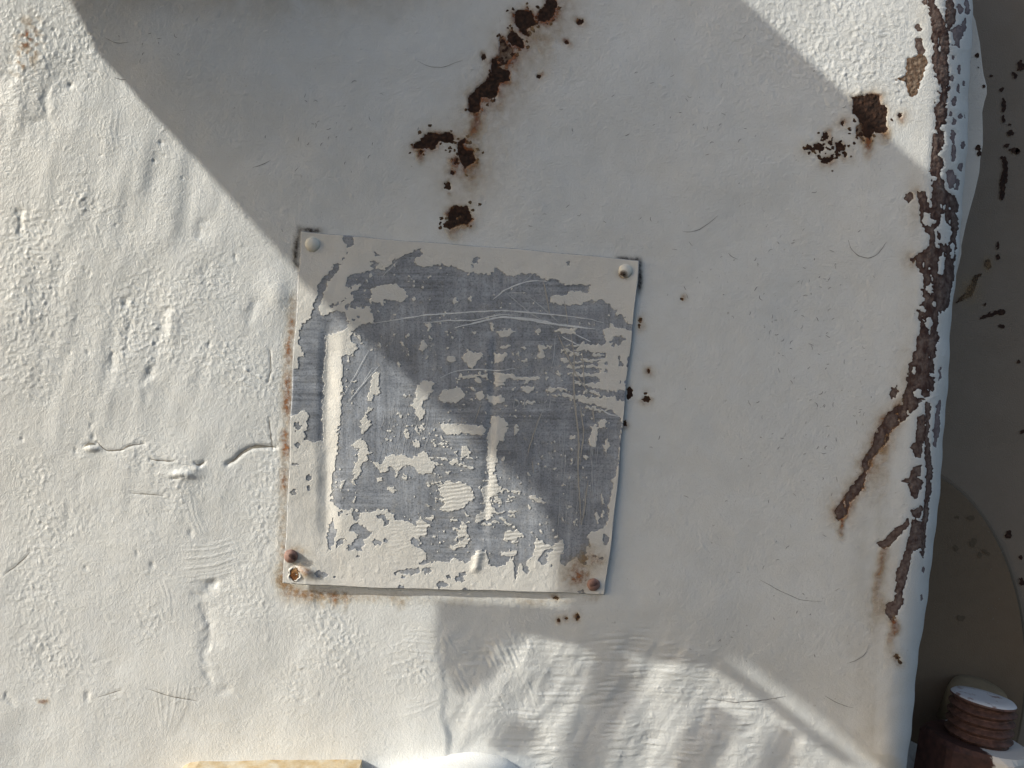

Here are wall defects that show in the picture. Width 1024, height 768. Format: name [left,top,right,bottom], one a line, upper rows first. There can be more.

corrosion [438,201,482,231]
corrosion [409,0,562,190]
corrosion [802,93,903,172]
peeling [283,232,639,594]